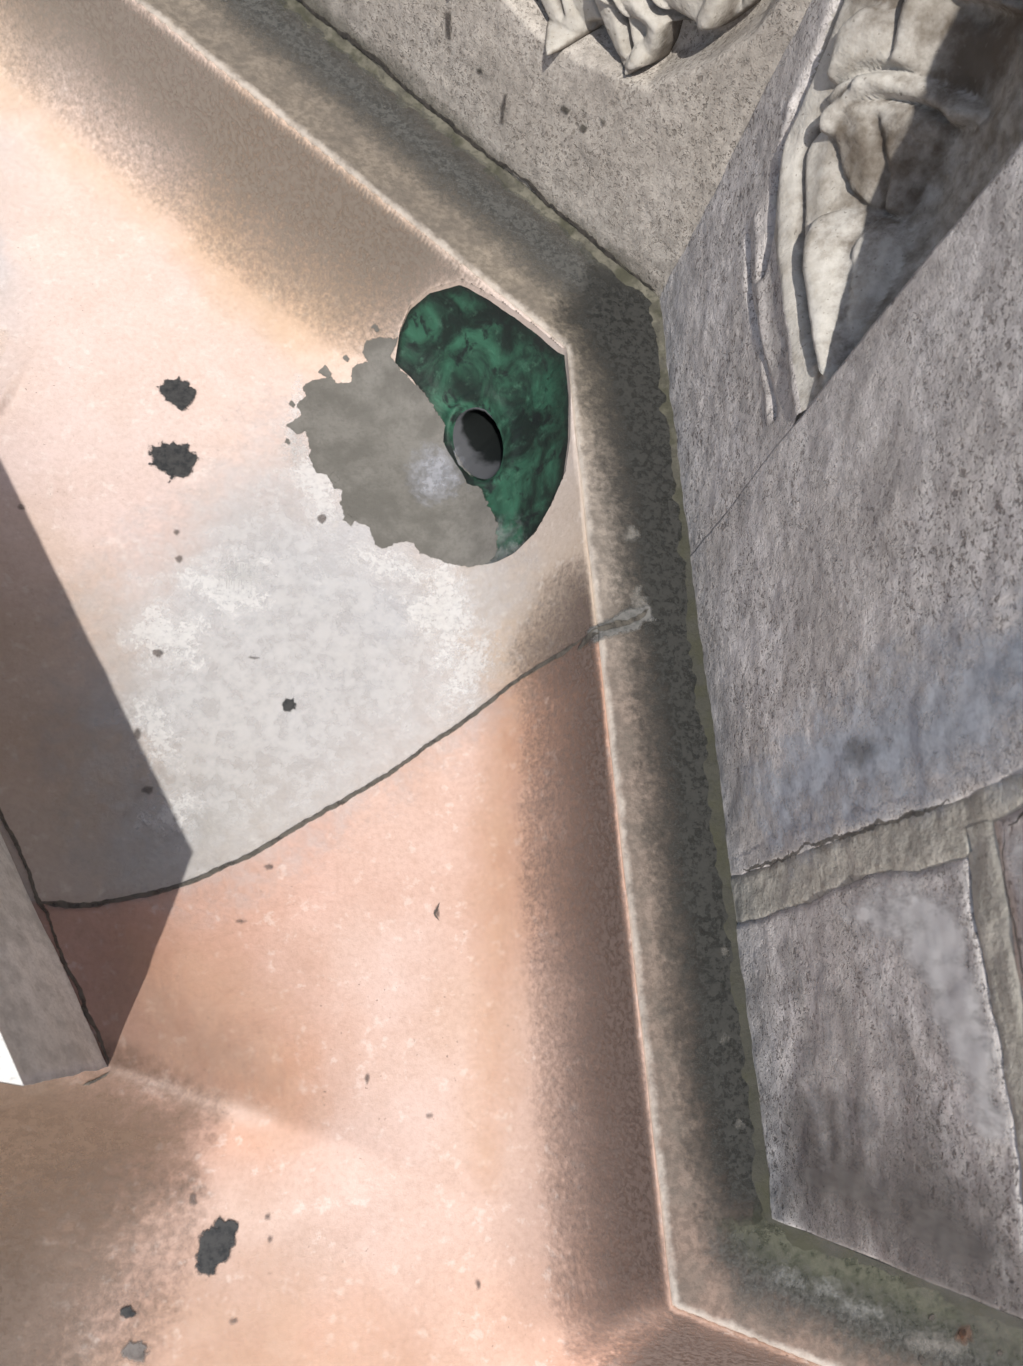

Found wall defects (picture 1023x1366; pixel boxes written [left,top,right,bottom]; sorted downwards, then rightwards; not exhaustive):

damp [0,0,466,331]
damp [148,442,198,483]
damp [157,376,196,411]
spalling [285,324,498,567]
damp [221,0,762,1222]
crack [0,606,654,1086]
damp [529,575,802,1366]
damp [854,889,1005,1135]
damp [195,1217,238,1276]
damp [781,1142,998,1292]